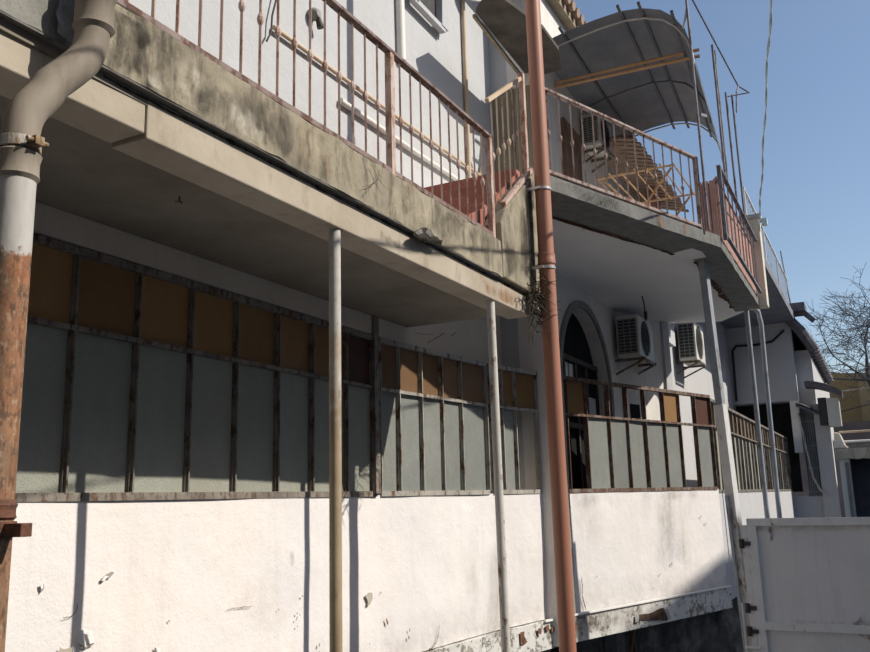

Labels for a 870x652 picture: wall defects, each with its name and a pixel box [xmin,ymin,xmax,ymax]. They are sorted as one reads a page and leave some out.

damp [508,184,534,274]
spalling [635,608,671,622]